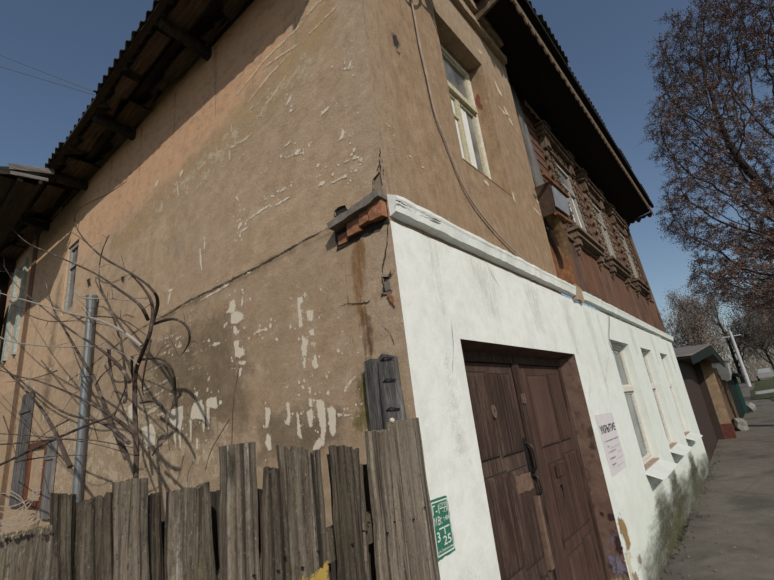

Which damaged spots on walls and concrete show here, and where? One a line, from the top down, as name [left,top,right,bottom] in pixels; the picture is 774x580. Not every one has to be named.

peeling [141,0,335,231]
peeling [228,181,292,241]
peeling [309,128,362,186]
flaking render [327,157,390,251]
peeling [53,280,278,495]
peeling [284,288,364,450]
peeling [600,512,642,580]
mould [646,456,711,580]